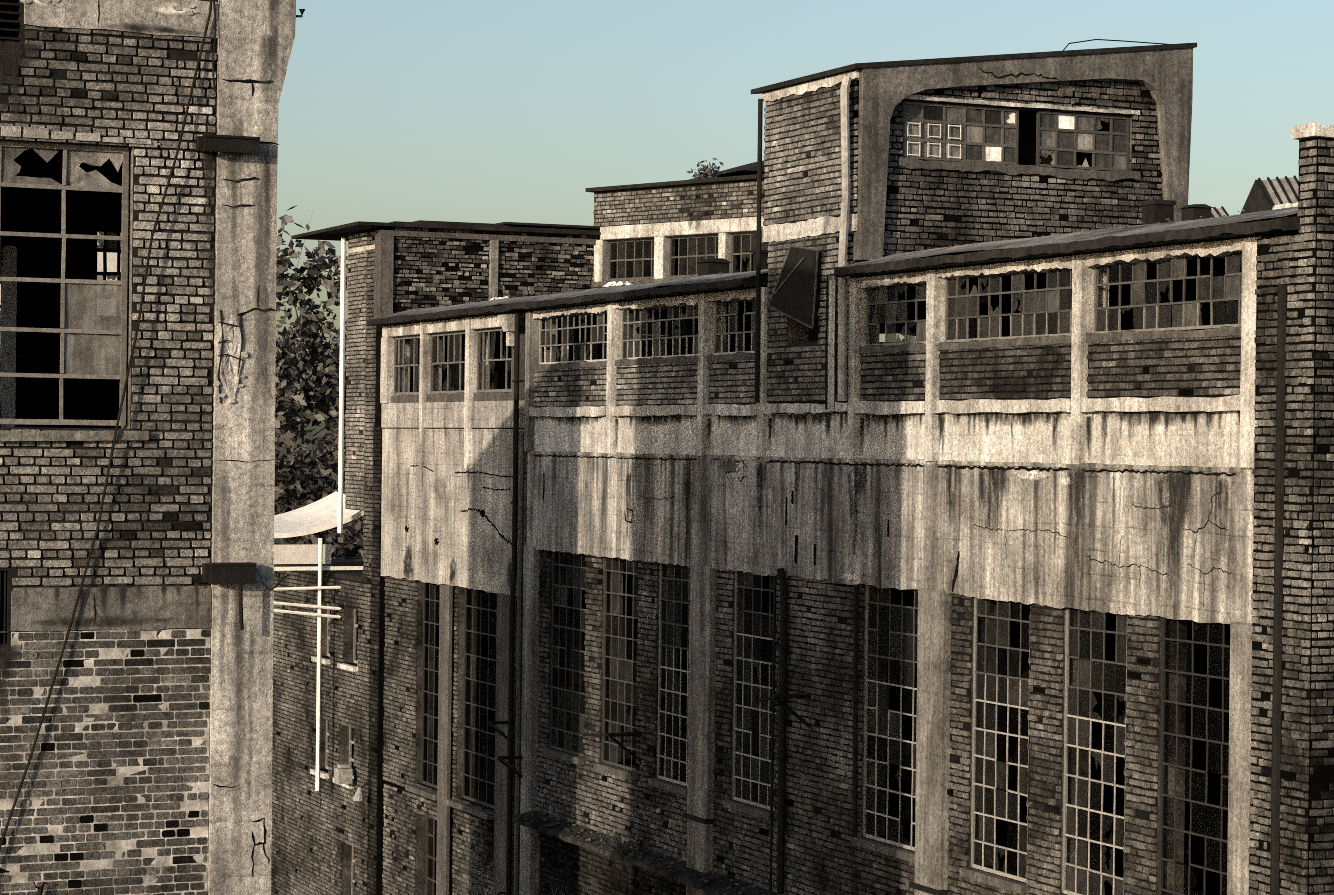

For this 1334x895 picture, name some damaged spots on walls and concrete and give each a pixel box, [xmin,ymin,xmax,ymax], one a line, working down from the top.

crack [222,79,274,97]
crack [223,177,259,208]
crack [237,286,277,316]
leakage [616,415,691,444]
leakage [938,412,1062,449]
leakage [707,413,921,532]
crack [410,455,1236,607]
leakage [945,464,960,510]
leakage [980,466,1010,523]
leakage [1034,469,1093,539]
leakage [1111,472,1123,524]
leakage [1143,472,1190,554]